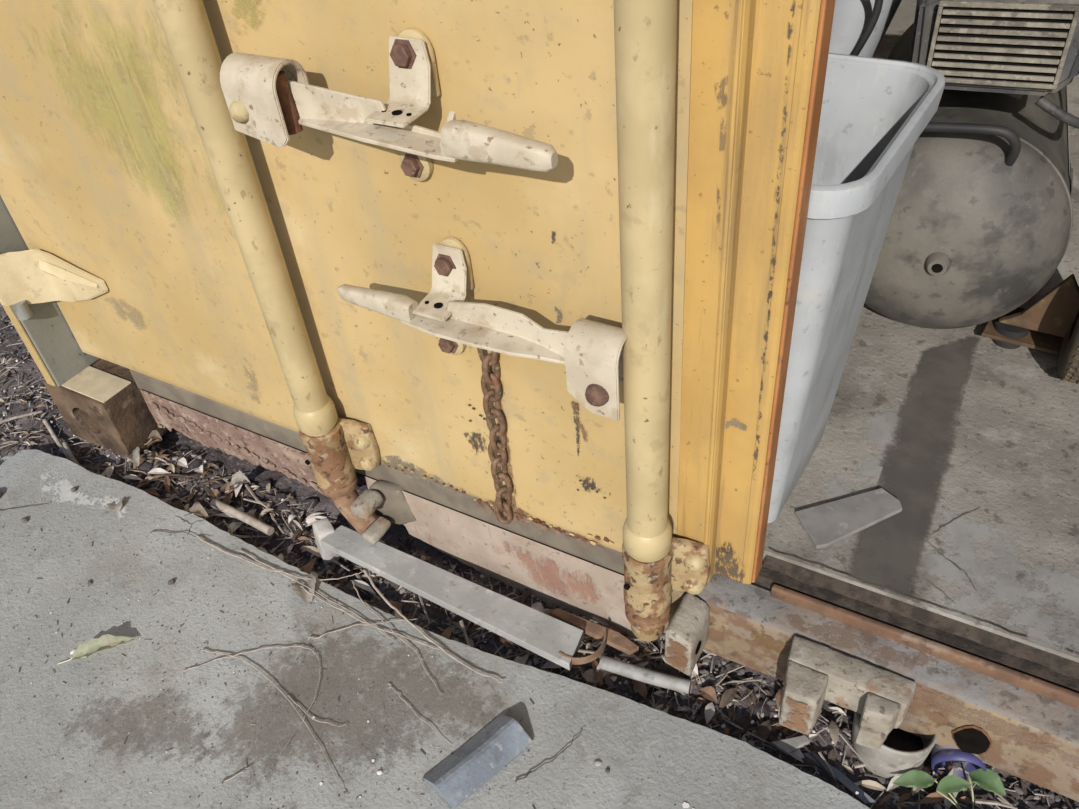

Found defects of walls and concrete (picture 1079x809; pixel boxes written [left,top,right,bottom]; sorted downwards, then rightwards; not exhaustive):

corrosion [140,390,322,493]
water stain [850,337,980,595]
corrosion [751,632,789,656]
corrosion [783,698,811,735]